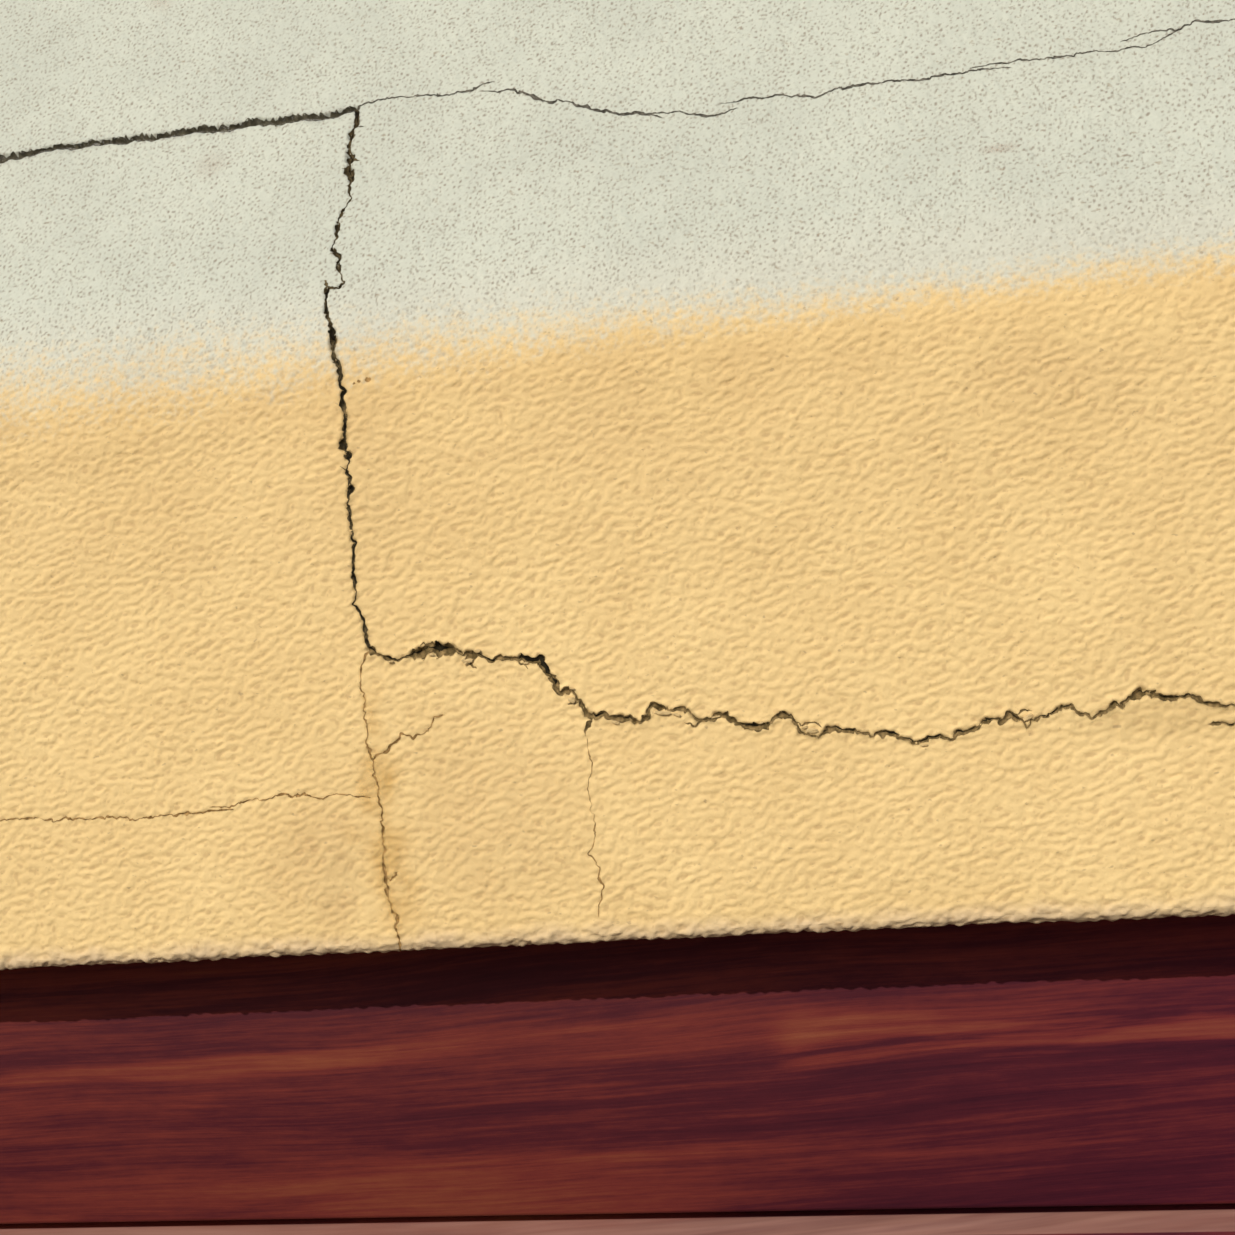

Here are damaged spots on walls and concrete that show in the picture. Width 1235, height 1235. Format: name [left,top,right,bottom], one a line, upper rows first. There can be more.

crack [0,19,1235,951]